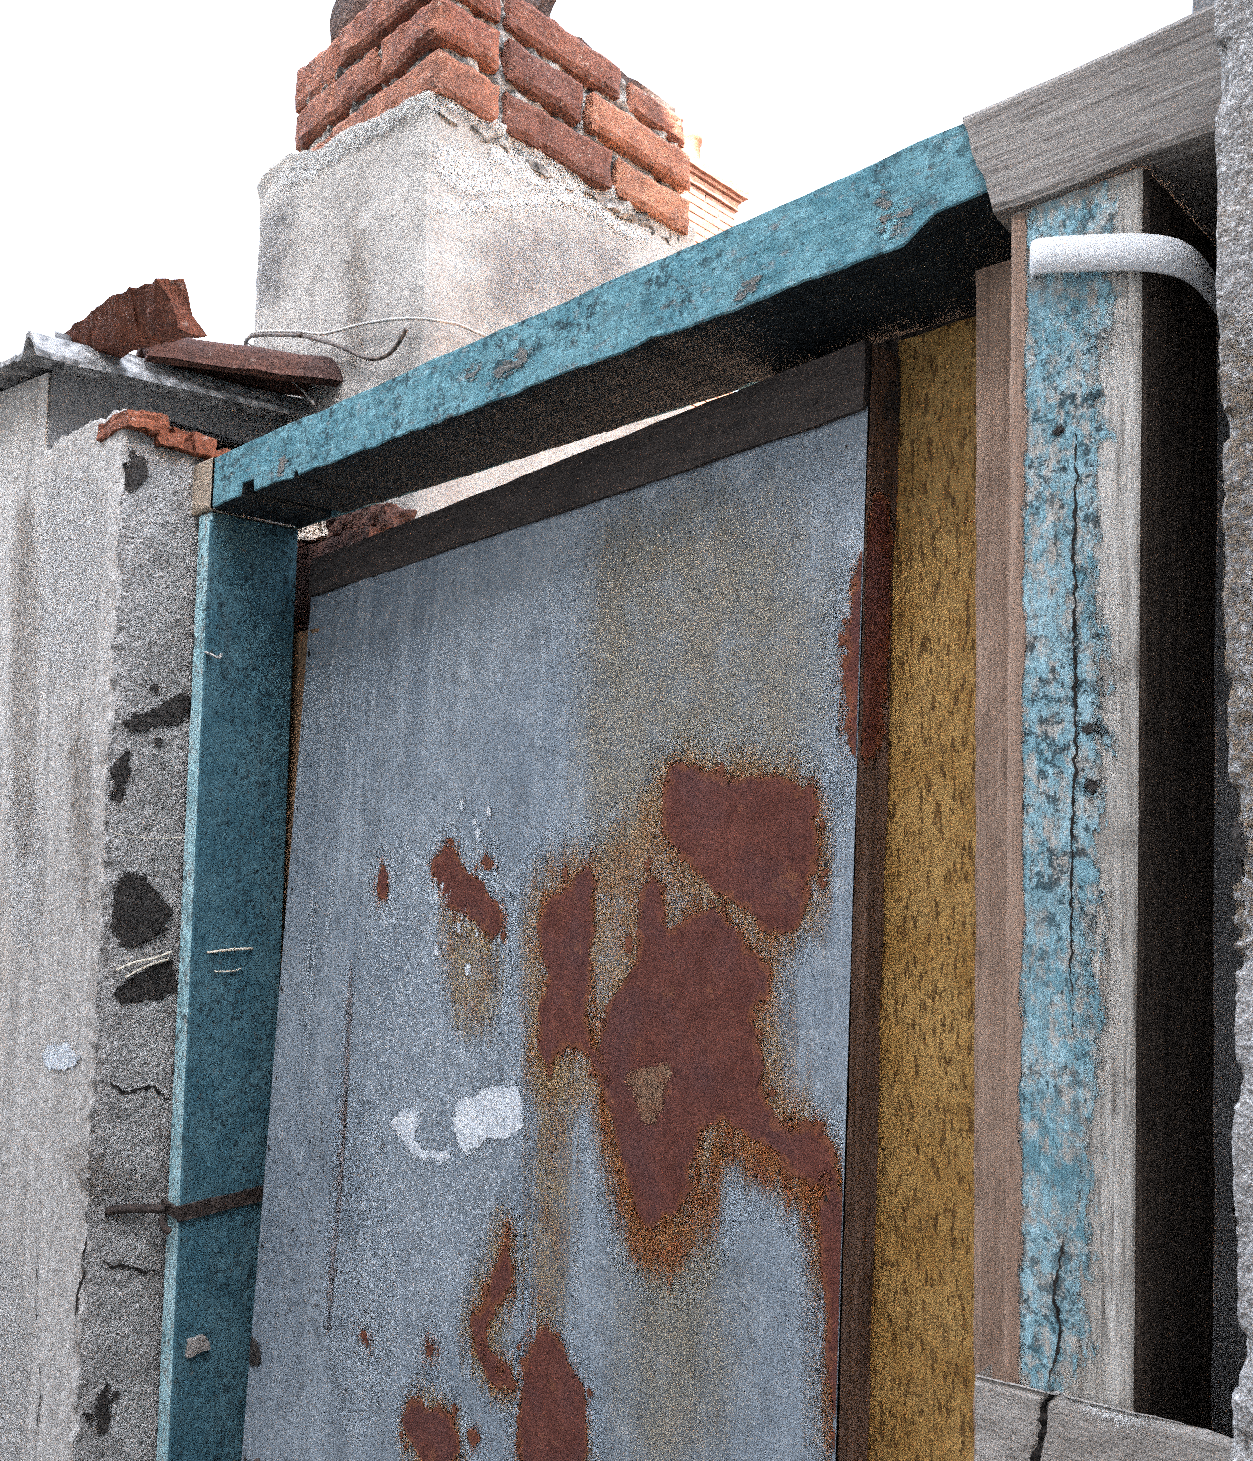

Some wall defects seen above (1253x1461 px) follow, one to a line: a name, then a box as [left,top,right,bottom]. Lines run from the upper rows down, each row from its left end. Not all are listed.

spalling [96,409,231,494]
spalling [110,749,132,804]
spalling [122,683,191,747]
crack [1068,419,1079,1038]
spalling [110,870,174,948]
rust [430,837,506,943]
spalling [112,960,178,1004]
rust [526,760,842,1450]
rust [469,1225,594,1461]
crack [1030,1238,1064,1461]